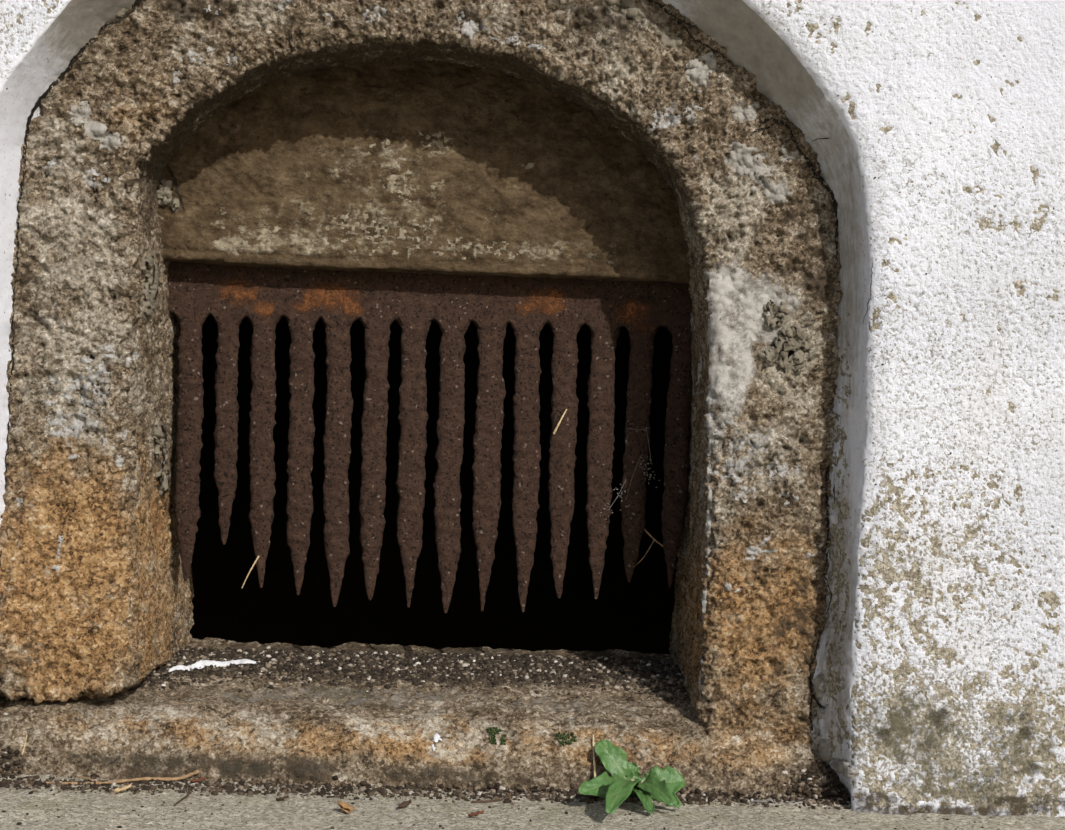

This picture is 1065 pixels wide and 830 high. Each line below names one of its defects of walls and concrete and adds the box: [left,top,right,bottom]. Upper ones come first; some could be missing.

peeling [805,17,841,54]
peeling [840,92,856,120]
peeling [780,145,798,162]
peeling [962,183,1002,198]
peeling [975,205,1054,234]
rust [221,279,275,317]
rust [294,284,362,315]
peeling [1005,280,1060,301]
peeling [809,333,1065,817]
leakage [868,691,960,764]
leakage [850,712,1065,816]